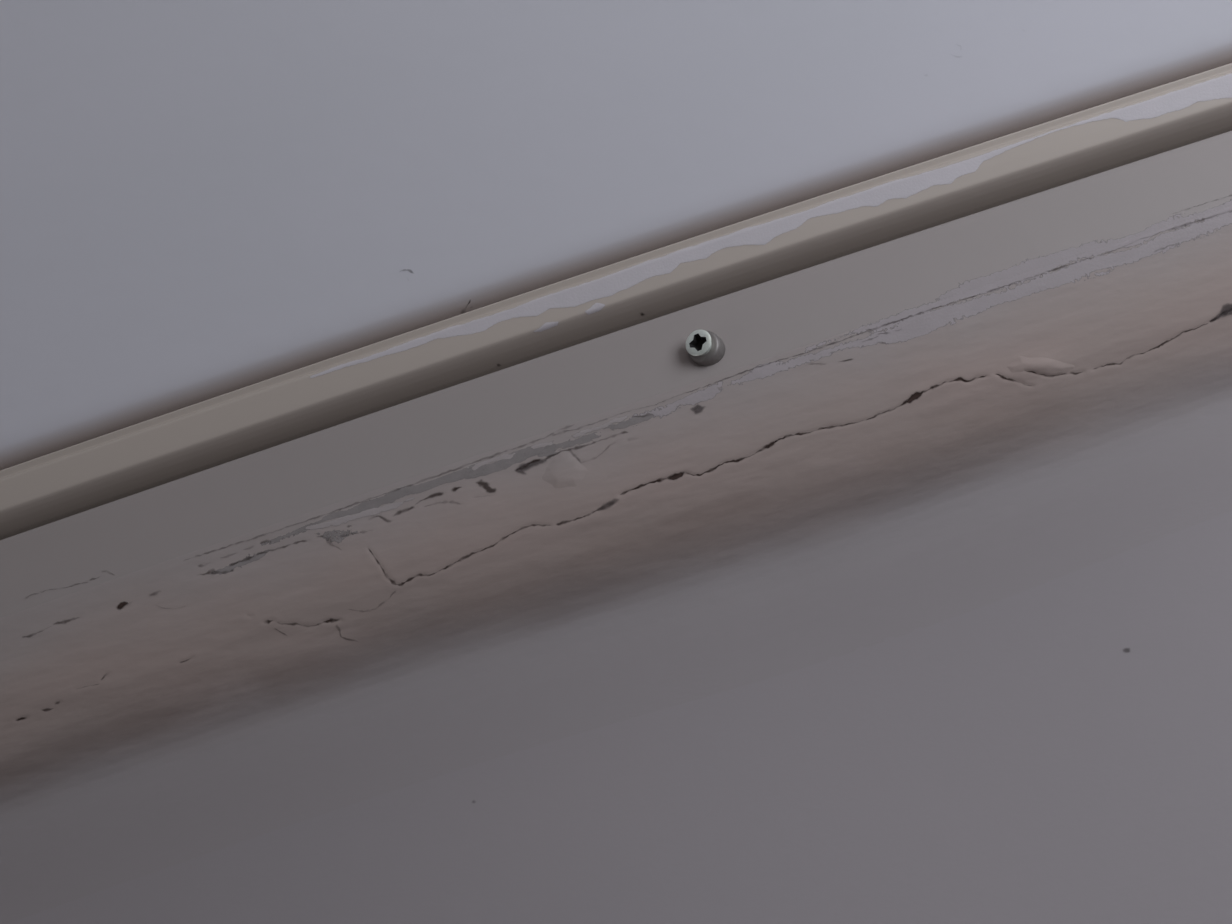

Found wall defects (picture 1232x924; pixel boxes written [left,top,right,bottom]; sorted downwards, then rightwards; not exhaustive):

crack [622,304,1232,494]
peeling [211,413,654,574]
crack [369,516,585,586]